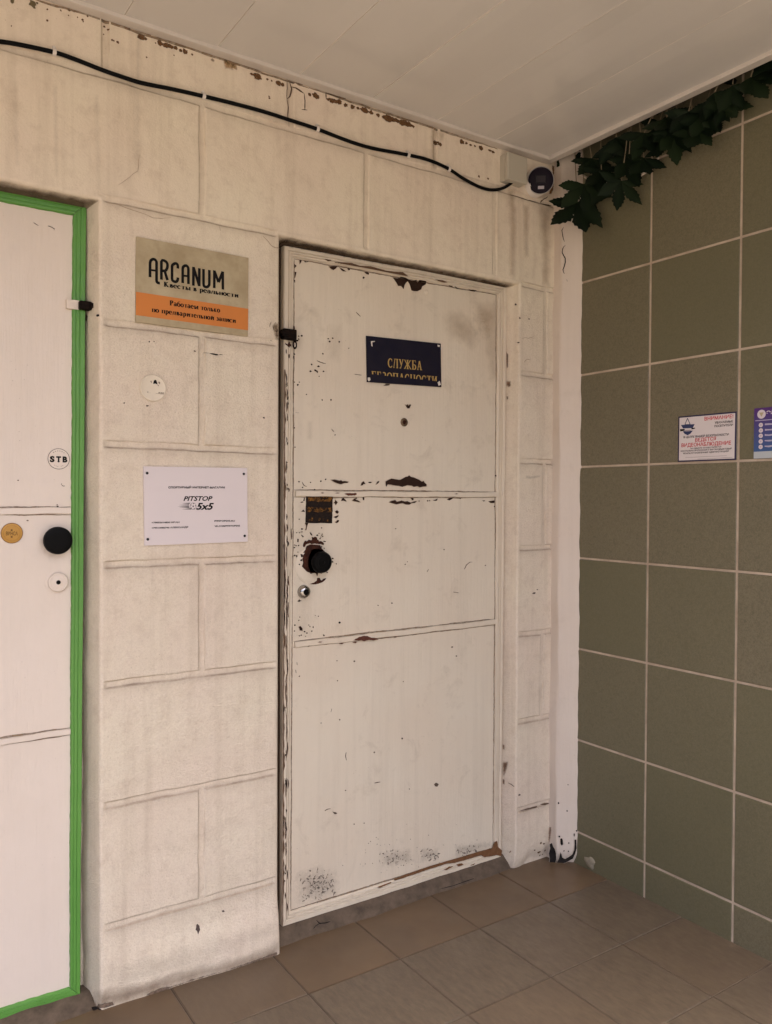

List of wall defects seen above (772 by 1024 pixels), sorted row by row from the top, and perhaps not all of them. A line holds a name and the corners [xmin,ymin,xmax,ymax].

corrosion [294,248,495,295]
peeling [325,259,477,292]
peeling [238,369,461,967]
corrosion [270,323,514,910]